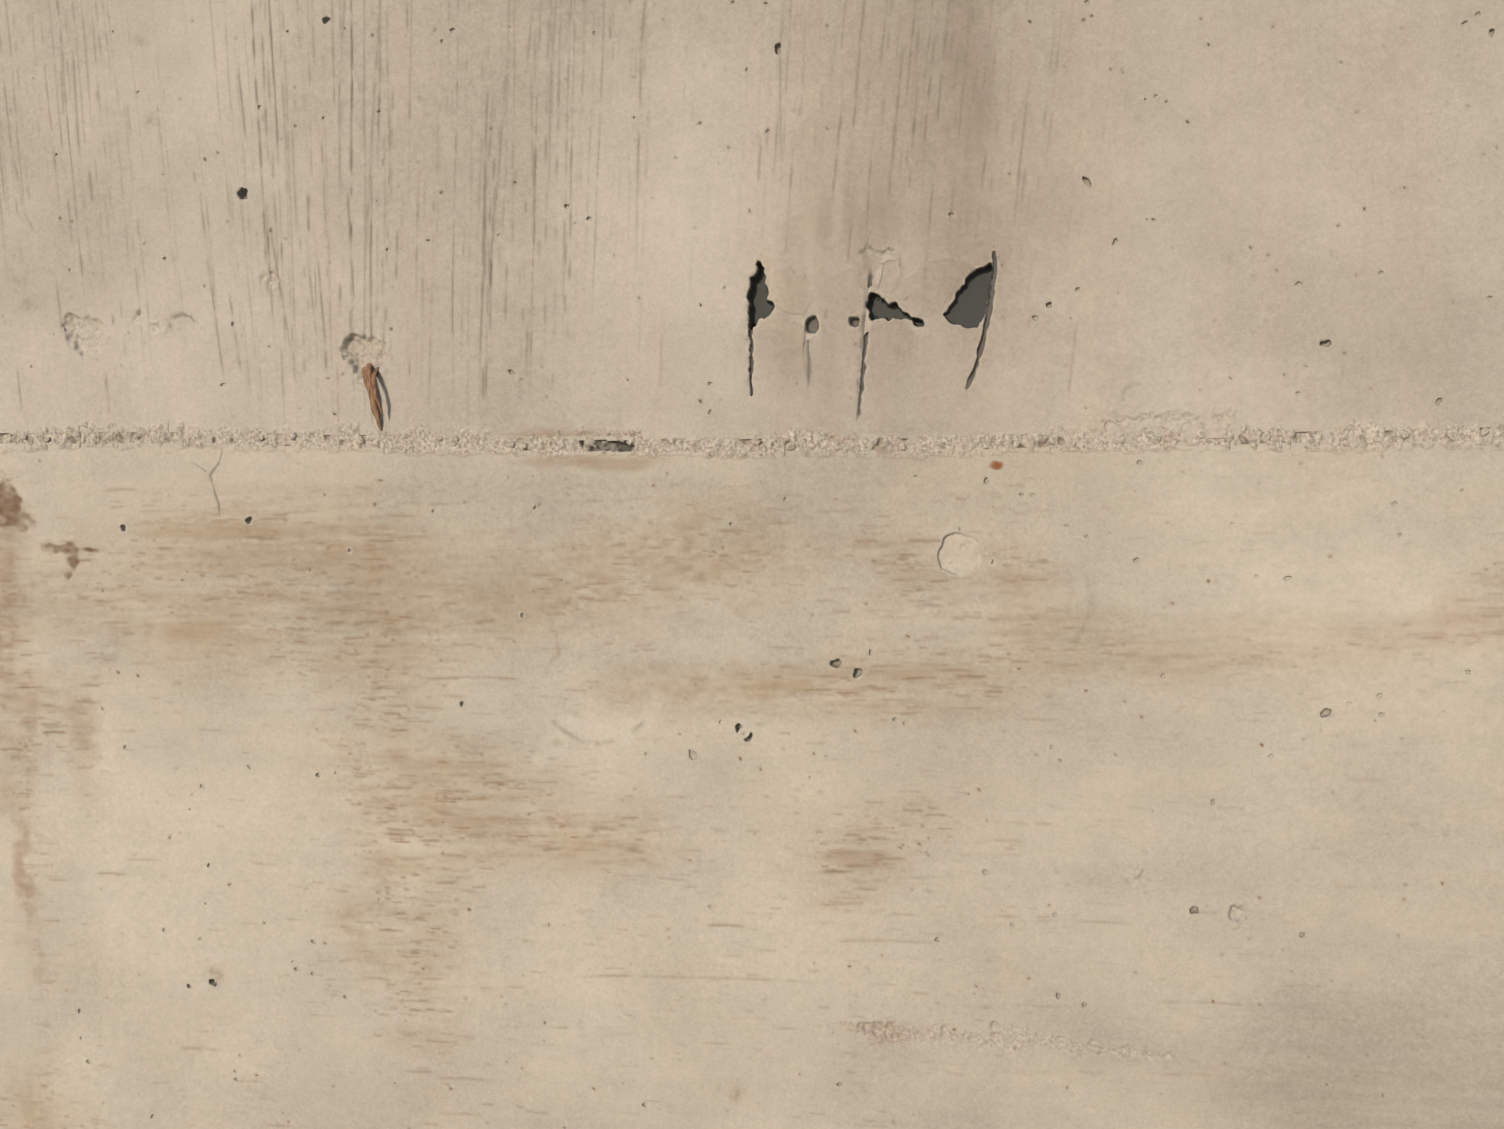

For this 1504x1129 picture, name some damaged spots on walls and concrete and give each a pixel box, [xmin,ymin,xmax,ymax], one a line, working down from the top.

spalling [53,303,117,366]
peeling [749,251,978,397]
rust [0,485,21,525]